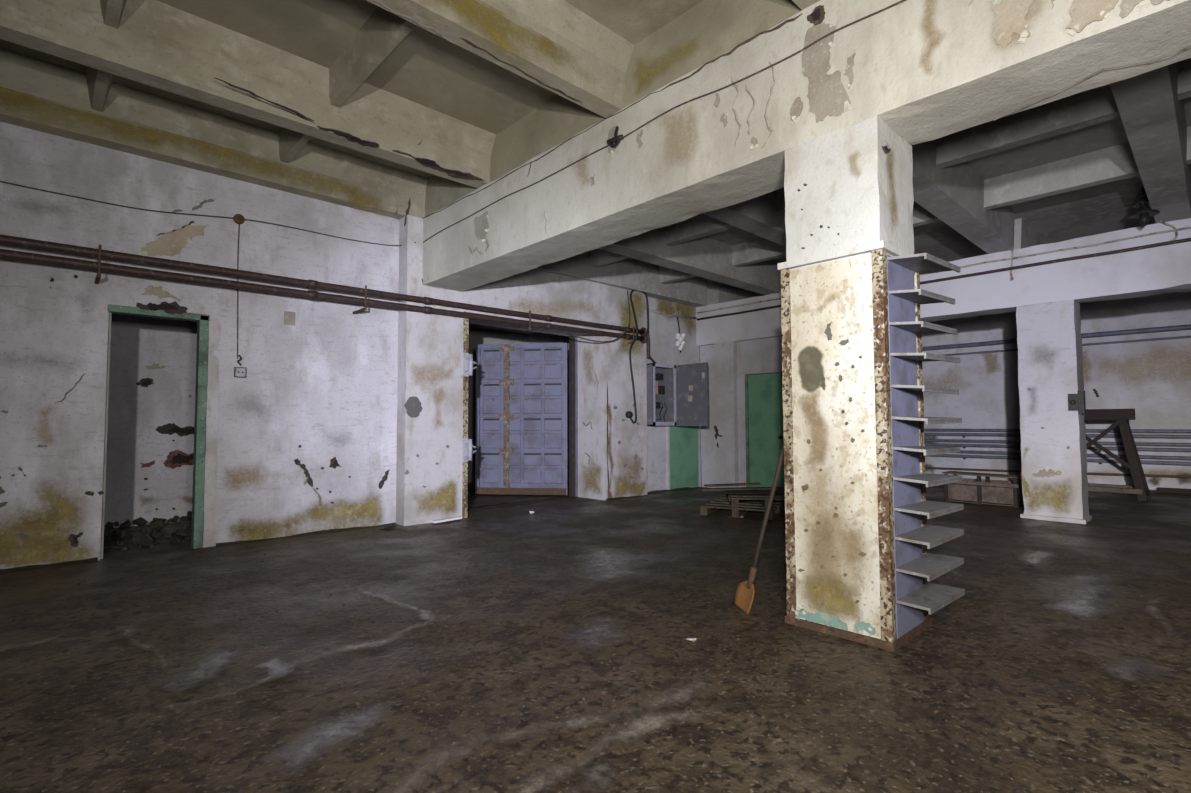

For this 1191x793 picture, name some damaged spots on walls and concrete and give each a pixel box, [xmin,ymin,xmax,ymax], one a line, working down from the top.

peeling [992,0,1034,48]
peeling [1052,0,1170,36]
peeling [790,5,856,123]
peeling [140,221,208,257]
leakage [803,374,825,460]
spalling [140,423,194,490]
leakage [0,487,88,566]
leakage [237,498,380,541]
leakage [807,476,859,615]